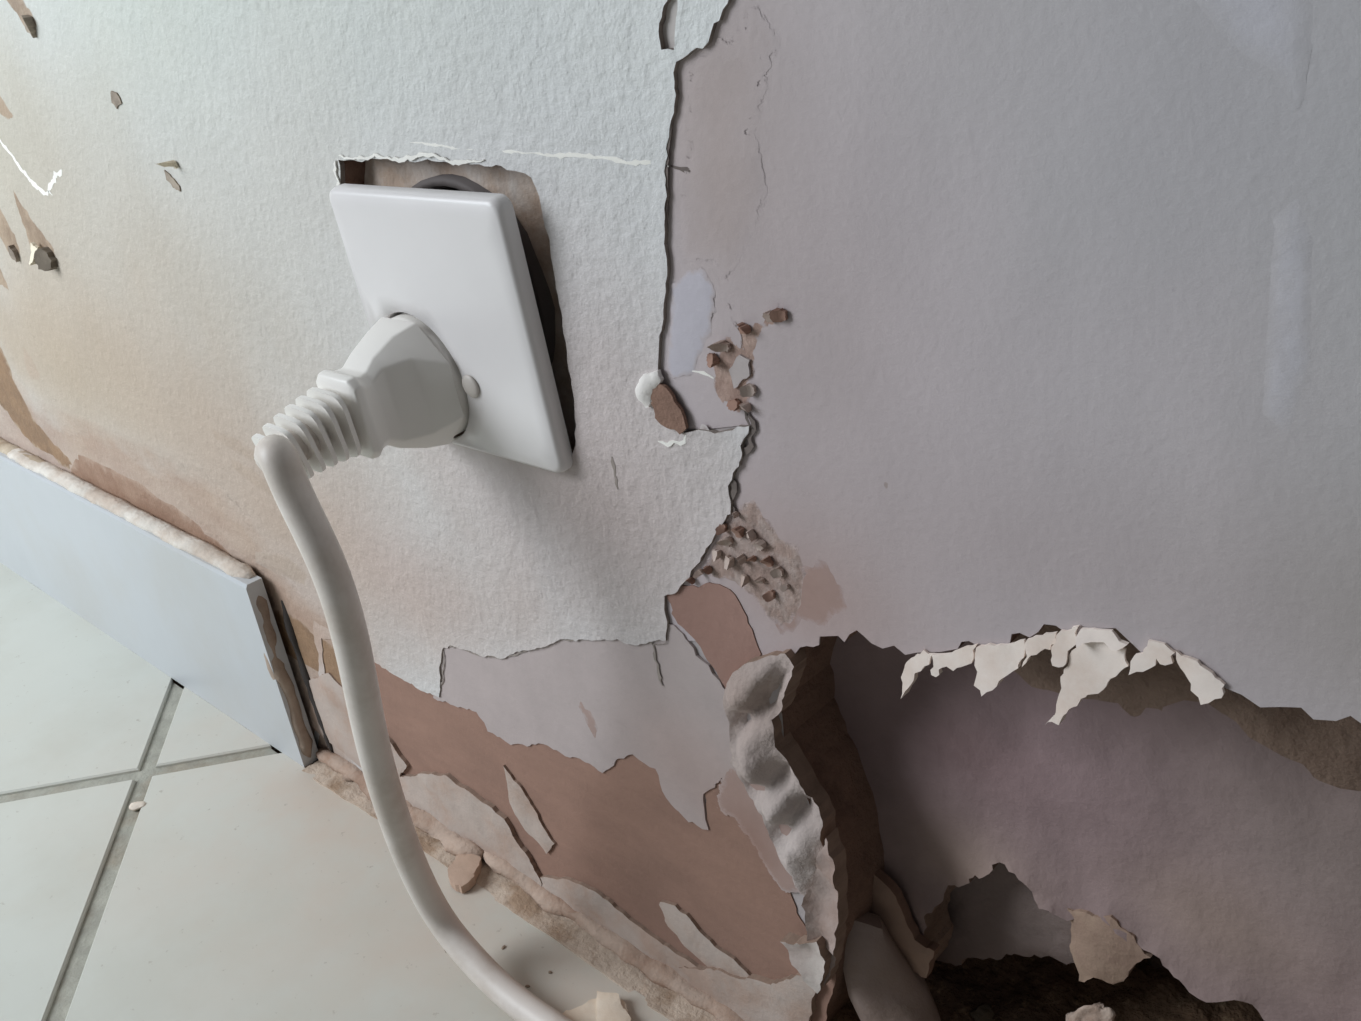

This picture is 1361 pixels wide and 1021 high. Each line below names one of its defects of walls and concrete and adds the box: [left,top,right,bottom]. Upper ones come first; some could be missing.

flaking render [309,672,371,801]
peeling [375,0,1361,1021]